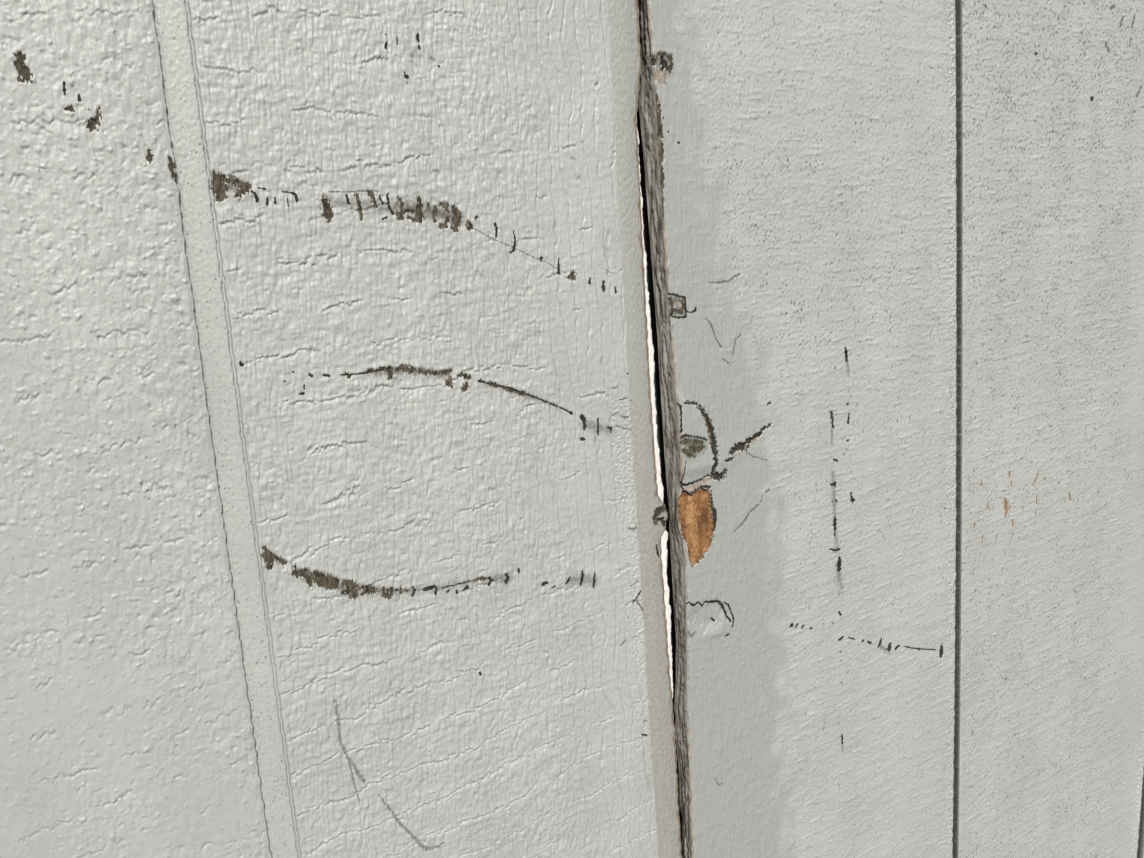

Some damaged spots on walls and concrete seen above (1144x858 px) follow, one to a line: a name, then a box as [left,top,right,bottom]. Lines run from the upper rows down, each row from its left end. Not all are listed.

peeling [12,51,33,83]
peeling [63,81,102,132]
peeling [210,170,299,207]
peeling [320,190,617,293]
crack [284,363,612,441]
peeling [677,401,728,493]
peeling [260,546,520,601]
peeling [541,570,596,589]